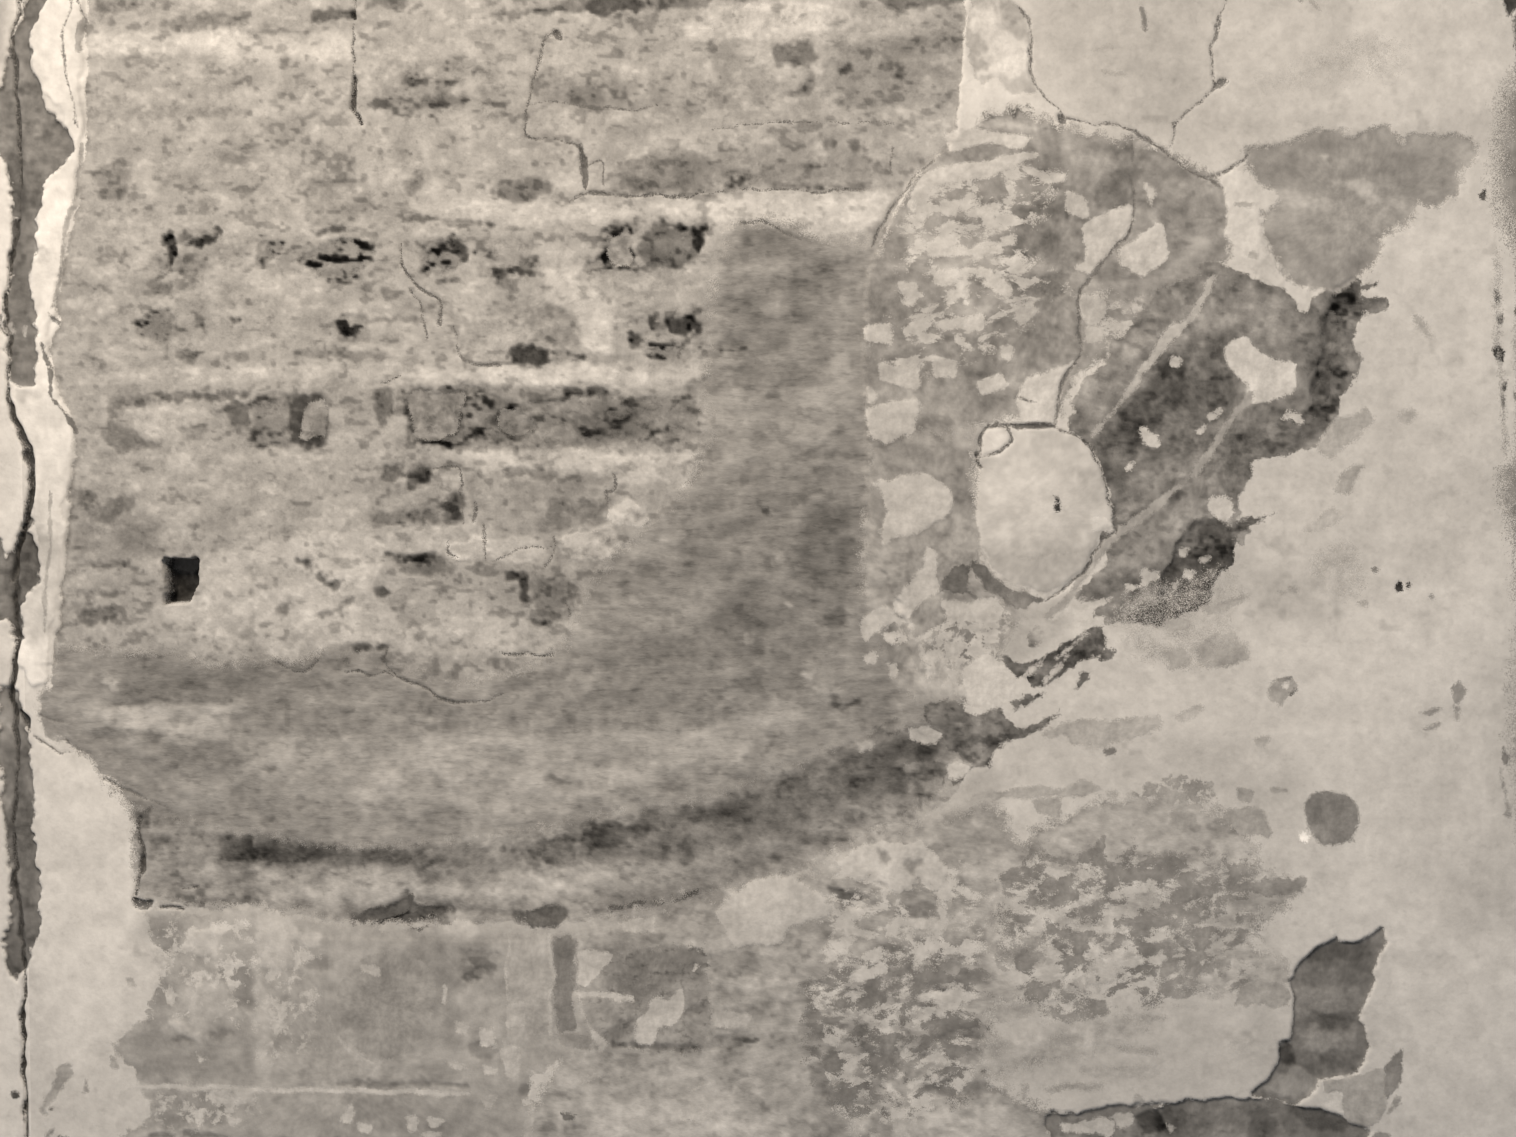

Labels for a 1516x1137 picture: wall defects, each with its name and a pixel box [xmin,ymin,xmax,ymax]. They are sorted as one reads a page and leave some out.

crack [349,1,363,125]
spalling [0,0,76,388]
crack [974,0,1249,602]
peeling [1221,170,1285,287]
spalling [1240,123,1480,295]
damp [1478,65,1516,606]
crack [0,0,199,1137]
peeling [1026,625,1045,648]
peeling [1076,670,1091,690]
damp [1106,562,1252,673]
spalling [1251,927,1404,1128]
spalling [1044,1096,1370,1137]